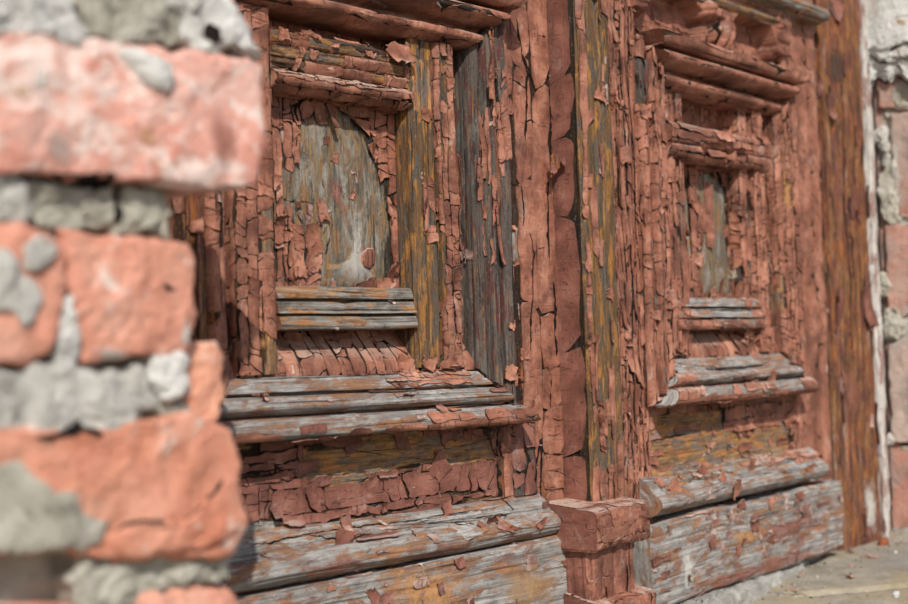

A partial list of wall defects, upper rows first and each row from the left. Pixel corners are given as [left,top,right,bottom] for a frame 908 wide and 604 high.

peeling [273,109,397,288]
peeling [271,23,434,122]
crack [509,18,558,356]
peeling [594,0,625,380]
peeling [689,129,735,146]
peeling [685,172,746,298]
spalling [107,476,547,565]
peeling [294,322,537,498]
peeling [365,555,466,604]
crack [496,378,566,510]
peeling [650,405,819,557]
peeling [675,359,799,387]